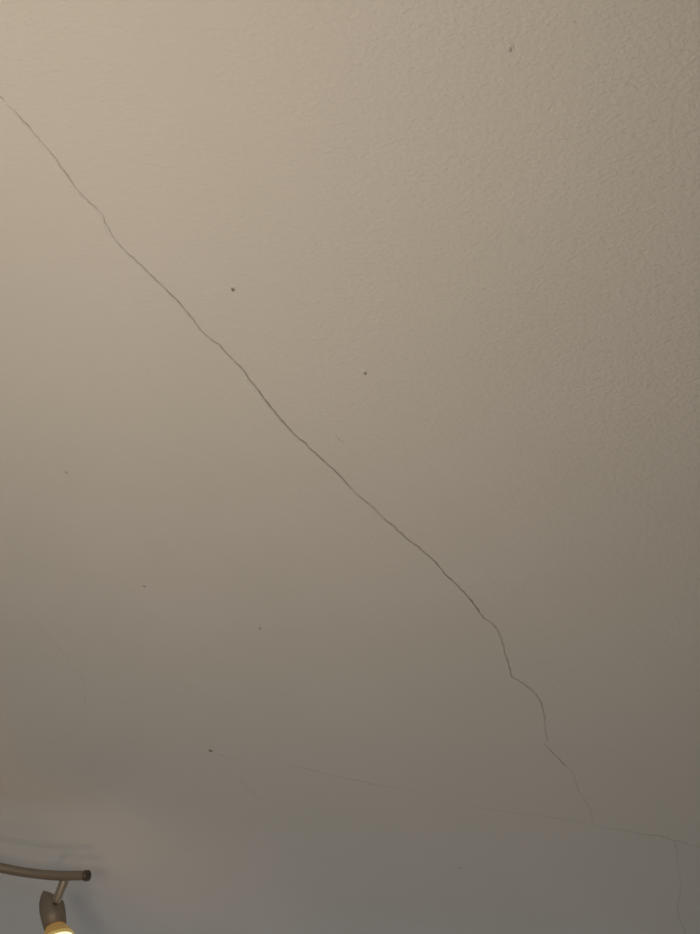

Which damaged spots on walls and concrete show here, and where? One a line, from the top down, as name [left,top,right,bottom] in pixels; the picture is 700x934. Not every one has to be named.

crack [0,98,574,776]